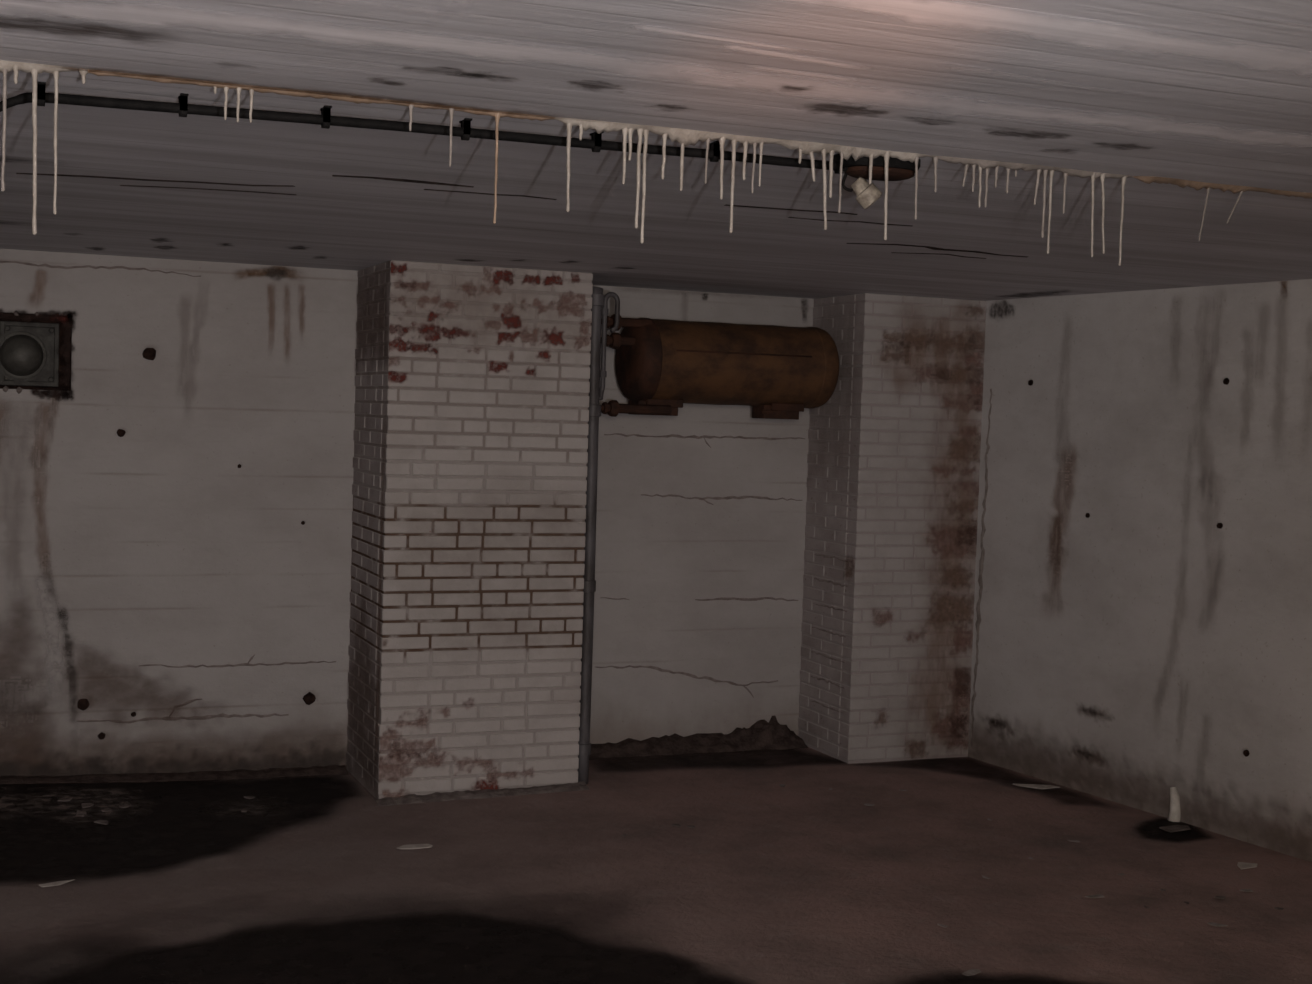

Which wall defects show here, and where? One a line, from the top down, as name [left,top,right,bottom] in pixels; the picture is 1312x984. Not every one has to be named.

damp [0,60,88,235]
damp [555,117,1312,266]
peeling [388,262,478,383]
peeling [463,260,588,375]
crack [595,665,778,698]
peeling [379,708,448,797]